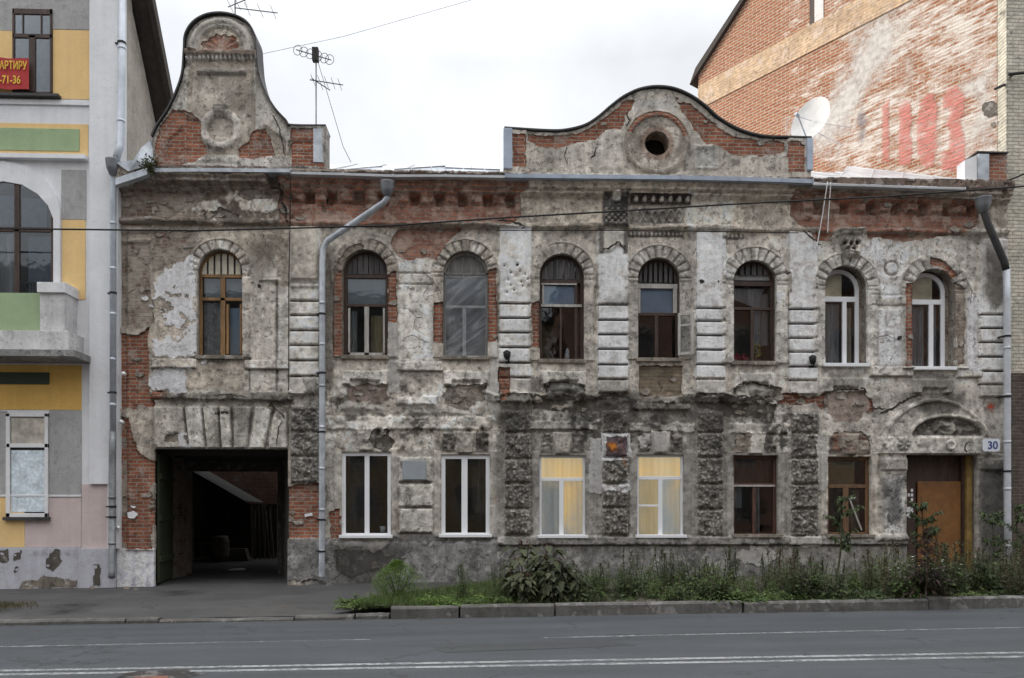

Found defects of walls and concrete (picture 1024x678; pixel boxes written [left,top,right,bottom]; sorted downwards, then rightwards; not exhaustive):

flaking render [155,110,207,165]
flaking render [237,97,806,261]
flaking render [204,207,240,225]
flaking render [116,182,207,550]
flaking render [442,367,511,411]
flaking render [638,365,873,456]
crack [828,387,920,414]
flaking render [368,428,395,452]
flaking render [289,482,404,579]
peeling [0,548,77,589]
peeling [93,564,101,586]